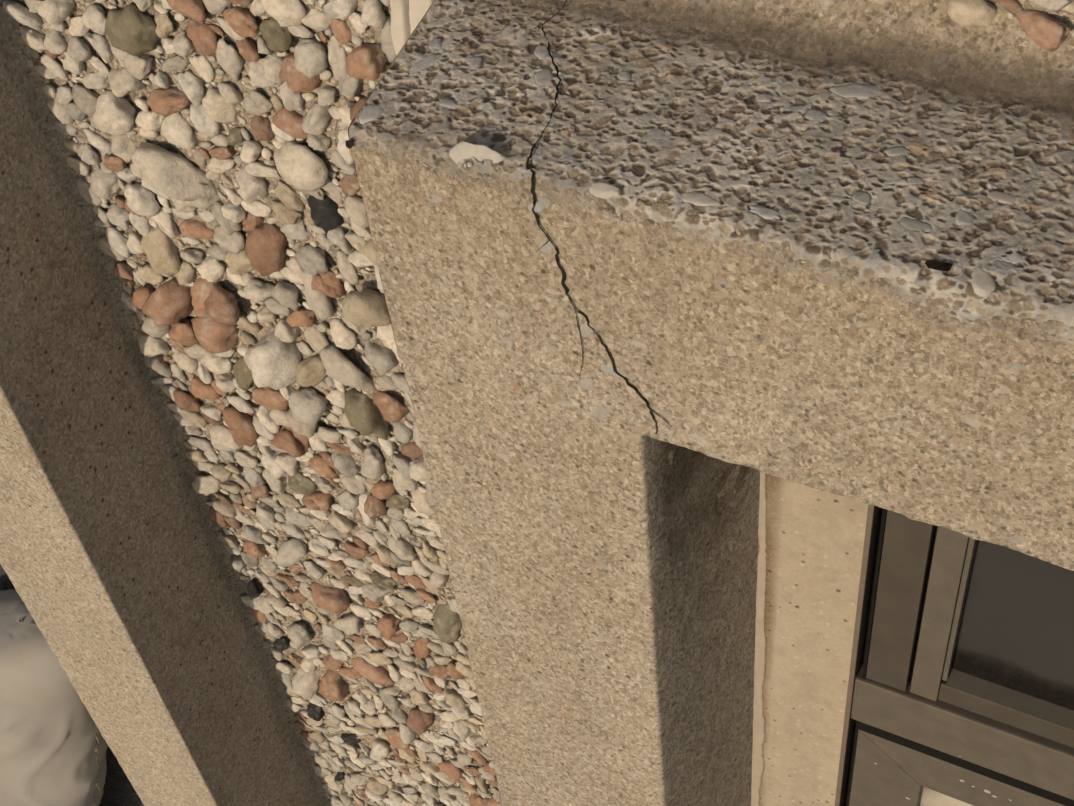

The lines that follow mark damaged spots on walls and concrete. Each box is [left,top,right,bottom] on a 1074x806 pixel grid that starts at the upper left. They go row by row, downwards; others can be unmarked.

crack [526,0,671,434]